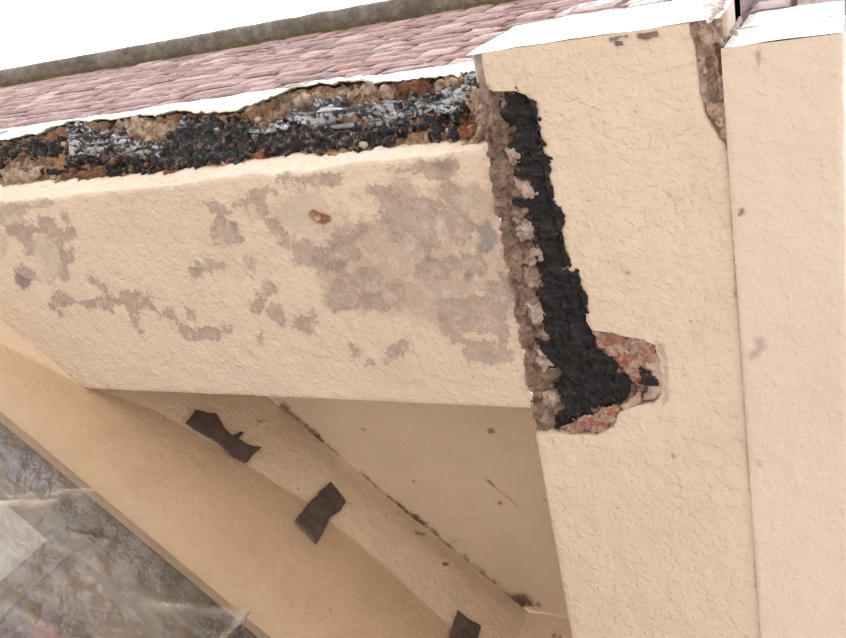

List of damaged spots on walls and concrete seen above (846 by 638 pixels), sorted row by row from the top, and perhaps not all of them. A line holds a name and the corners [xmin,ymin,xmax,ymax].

spalling [690,0,742,144]
damp [277,198,325,226]
spalling [0,54,668,435]
damp [476,222,495,252]
damp [15,274,29,287]